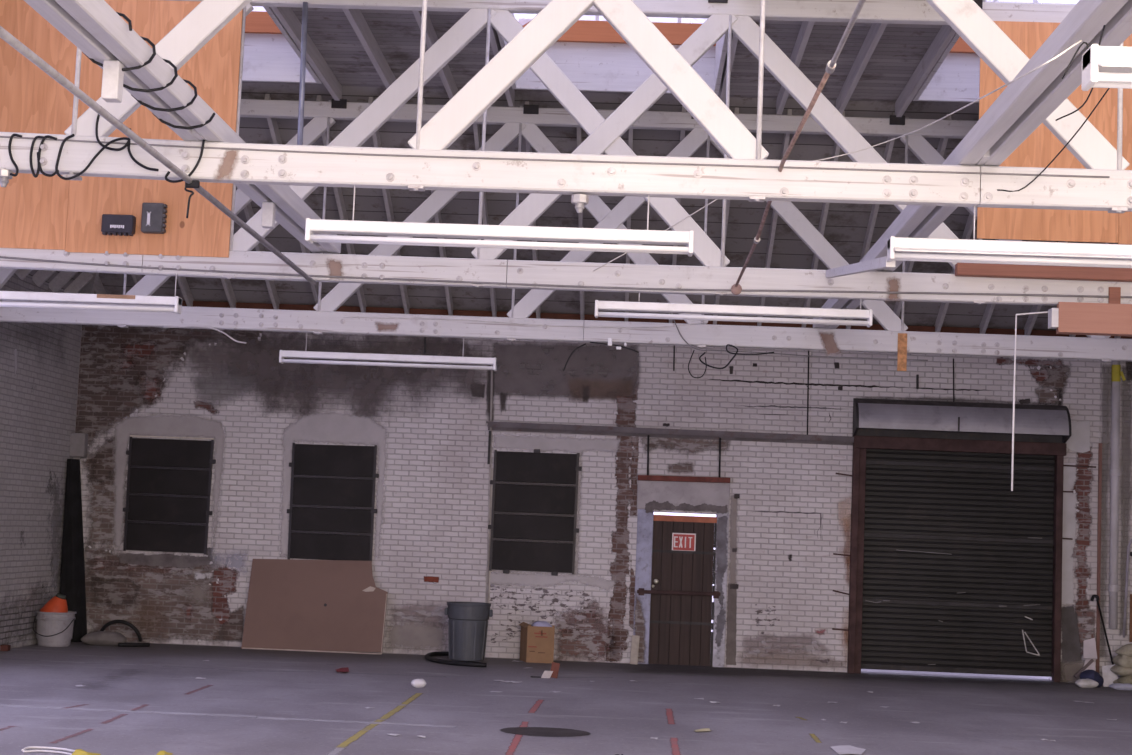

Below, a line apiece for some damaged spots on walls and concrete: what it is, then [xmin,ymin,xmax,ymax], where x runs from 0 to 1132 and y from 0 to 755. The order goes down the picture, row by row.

peeling [75,325,264,643]
water stain [376,323,398,331]
water stain [471,343,639,421]
flaking render [490,382,740,665]
peeling [996,357,1070,406]
flaking render [1072,446,1096,657]